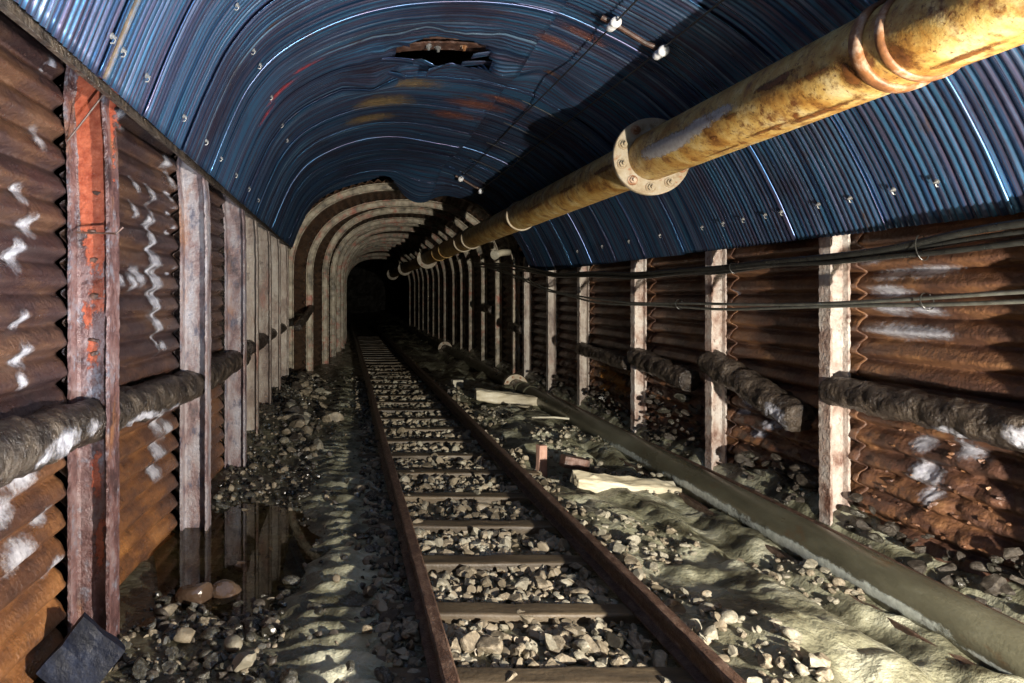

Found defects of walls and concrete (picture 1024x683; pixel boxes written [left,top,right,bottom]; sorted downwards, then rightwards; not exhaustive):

corrosion [888,42,918,70]
corrosion [933,42,1001,69]
corrosion [711,59,866,156]
efflorescence [4,244,24,264]
efflorescence [119,156,175,349]
efflorescence [11,349,31,387]
efflorescence [915,428,984,455]
efflorescence [1010,429,1024,446]
efflorescence [912,464,941,503]
efflorescence [7,539,32,573]